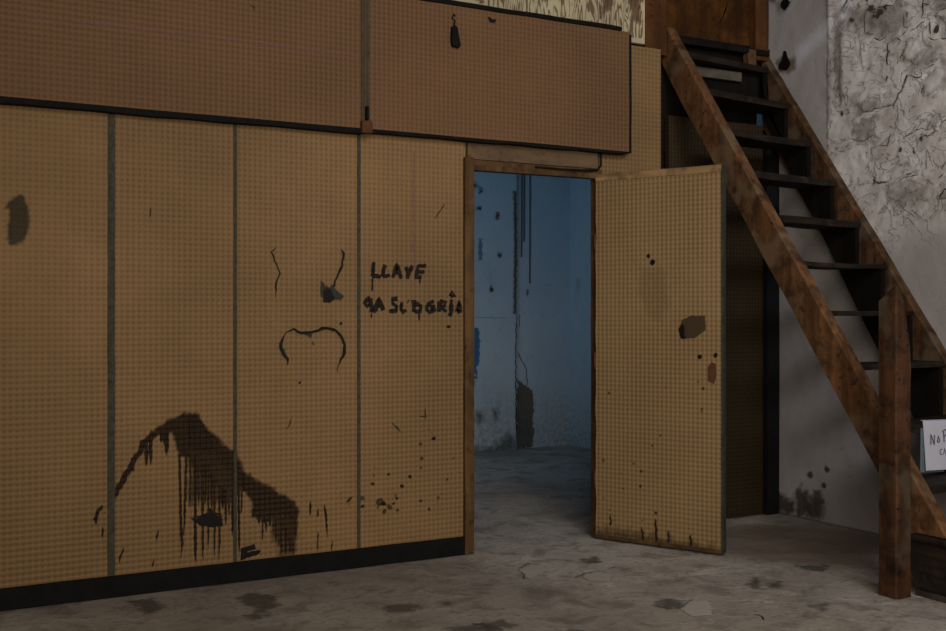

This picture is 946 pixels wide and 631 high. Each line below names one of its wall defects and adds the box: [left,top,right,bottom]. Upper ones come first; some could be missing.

crack [843,0,946,147]
crack [873,162,946,213]
water stain [115,413,333,560]